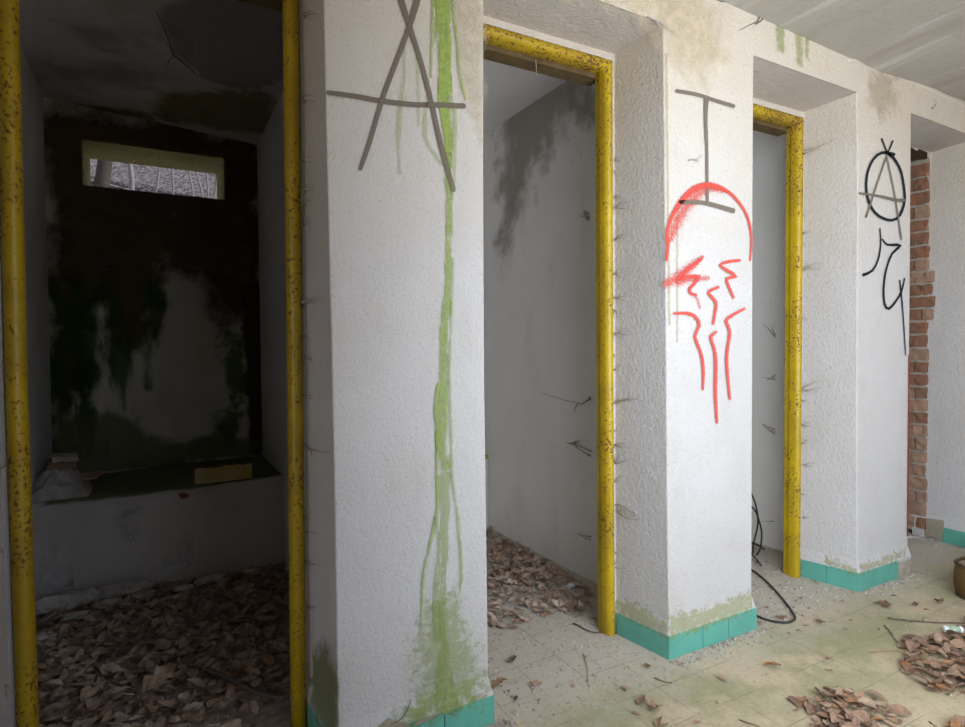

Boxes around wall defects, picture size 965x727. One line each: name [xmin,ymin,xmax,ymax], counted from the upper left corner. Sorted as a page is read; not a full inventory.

leakage [43,91,273,454]
leakage [421,0,467,631]
flaking render [908,147,944,539]